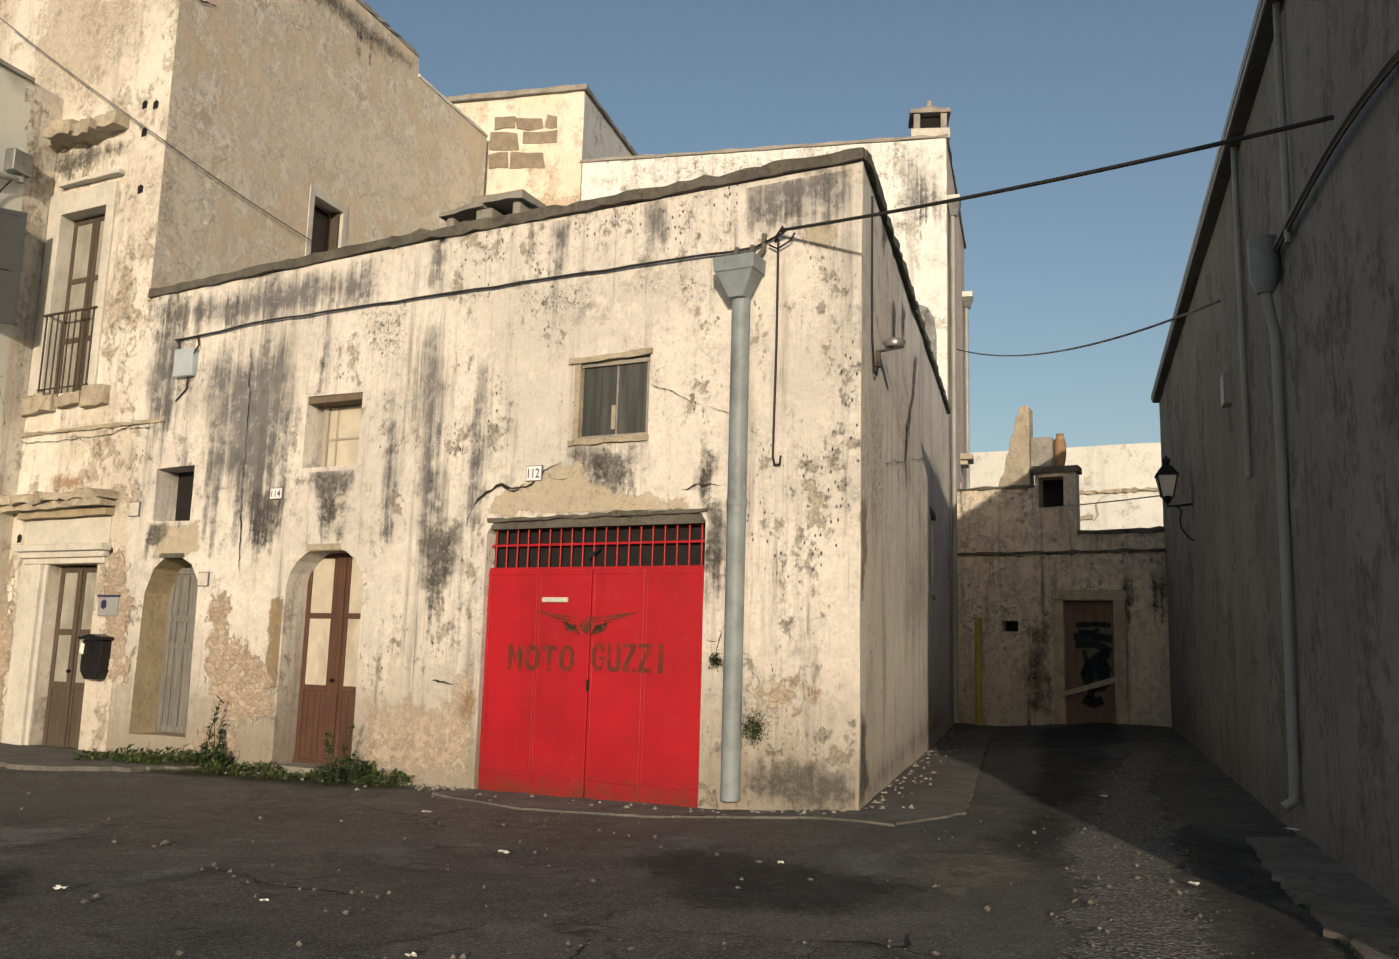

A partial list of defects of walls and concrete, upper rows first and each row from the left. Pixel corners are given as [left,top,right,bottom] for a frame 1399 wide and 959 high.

damp [320,0,411,64]
peeling [157,63,226,285]
flaking render [152,520,199,557]
damp [203,340,293,545]
damp [418,335,459,620]
damp [469,385,482,506]
crack [467,461,573,522]
flaking render [489,460,688,518]
damp [573,443,634,492]
spalling [97,549,135,685]
spalling [185,584,283,763]
flaking render [364,666,473,778]